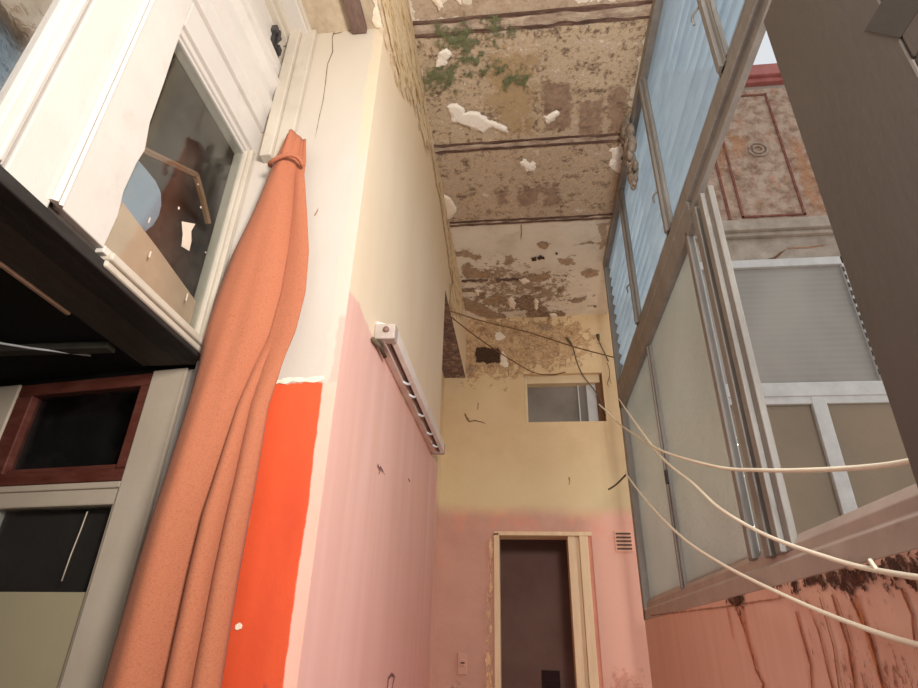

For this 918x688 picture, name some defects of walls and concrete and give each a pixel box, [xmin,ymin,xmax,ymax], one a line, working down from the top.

peeling [372,0,643,320]
spalling [475,347,501,364]
corrosion [772,551,918,688]